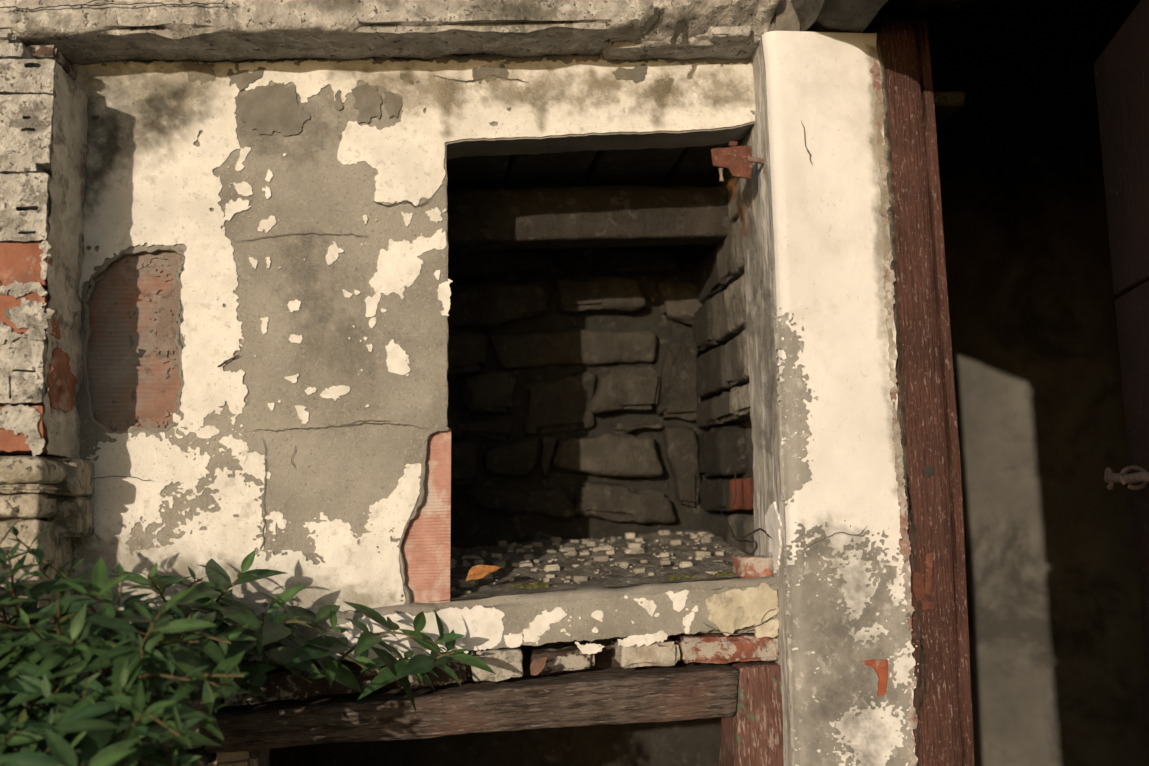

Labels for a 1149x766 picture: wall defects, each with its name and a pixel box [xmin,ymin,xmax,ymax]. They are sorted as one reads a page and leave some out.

peeling [46,47,919,766]